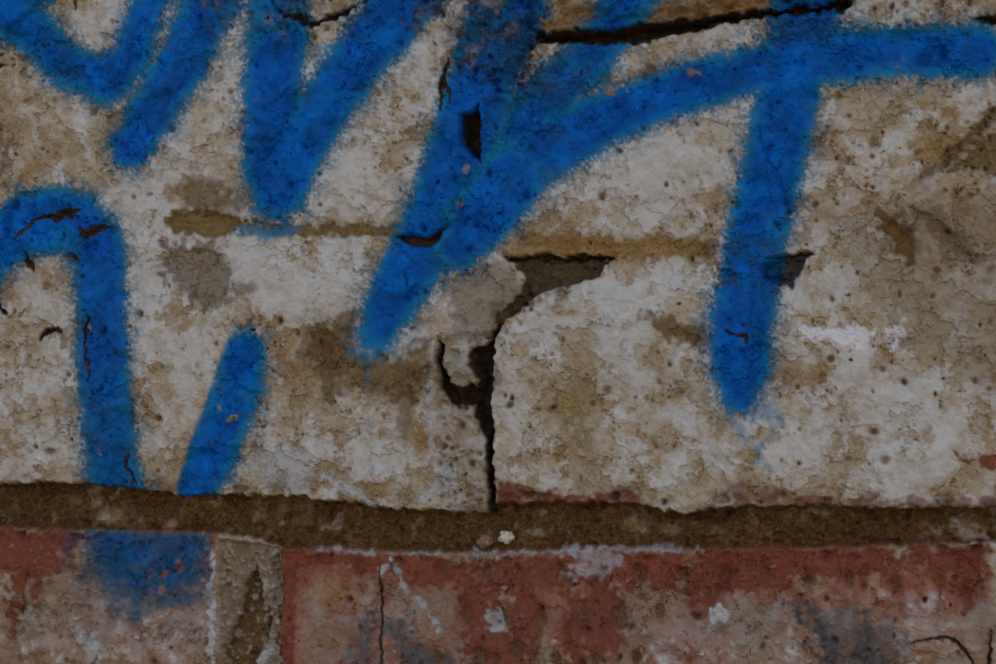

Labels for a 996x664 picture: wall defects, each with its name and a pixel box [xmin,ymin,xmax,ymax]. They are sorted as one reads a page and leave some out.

crack [439,341,498,512]